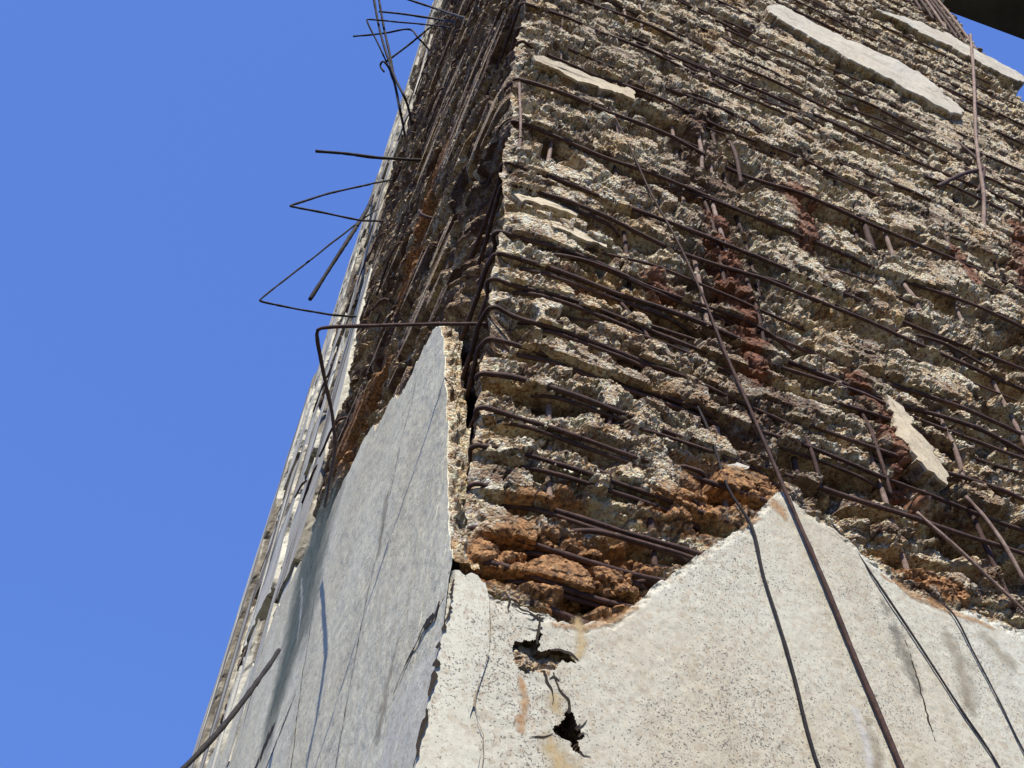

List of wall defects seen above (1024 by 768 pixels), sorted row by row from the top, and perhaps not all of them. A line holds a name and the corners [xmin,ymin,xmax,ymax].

rust [395,142,449,311]
rust [688,197,774,389]
rust [778,179,828,256]
rust [329,350,397,499]
spalling [192,0,1024,756]
rust [461,482,669,658]
rust [878,558,993,629]
peeling [188,719,233,768]
crack [473,591,591,768]